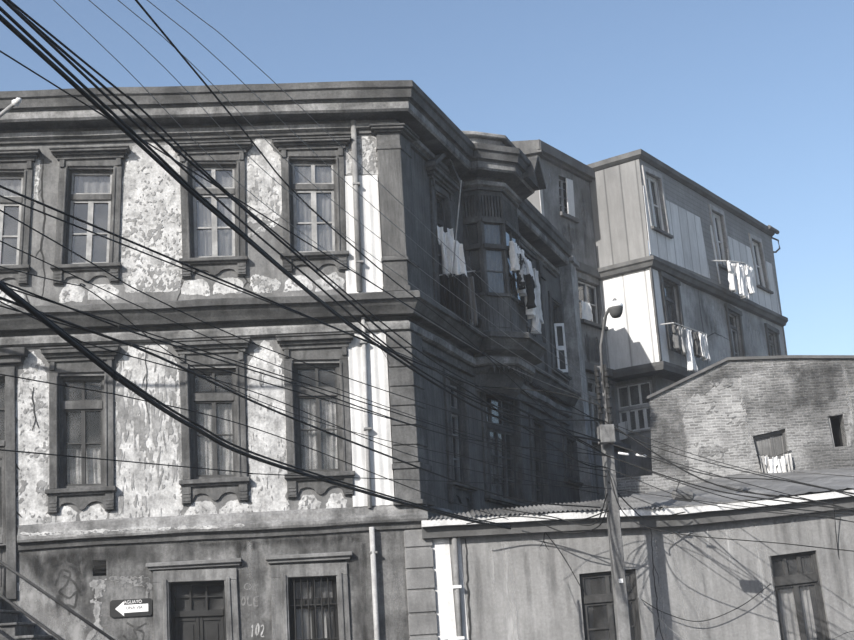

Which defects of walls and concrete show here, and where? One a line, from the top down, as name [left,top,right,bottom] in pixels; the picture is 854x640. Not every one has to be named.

peeling [344,135,378,175]
crack [32,159,46,300]
peeling [59,138,345,303]
peeling [0,288,25,305]
crack [31,387,39,430]
crack [141,355,150,424]
peeling [16,340,347,536]
peeling [17,579,86,640]